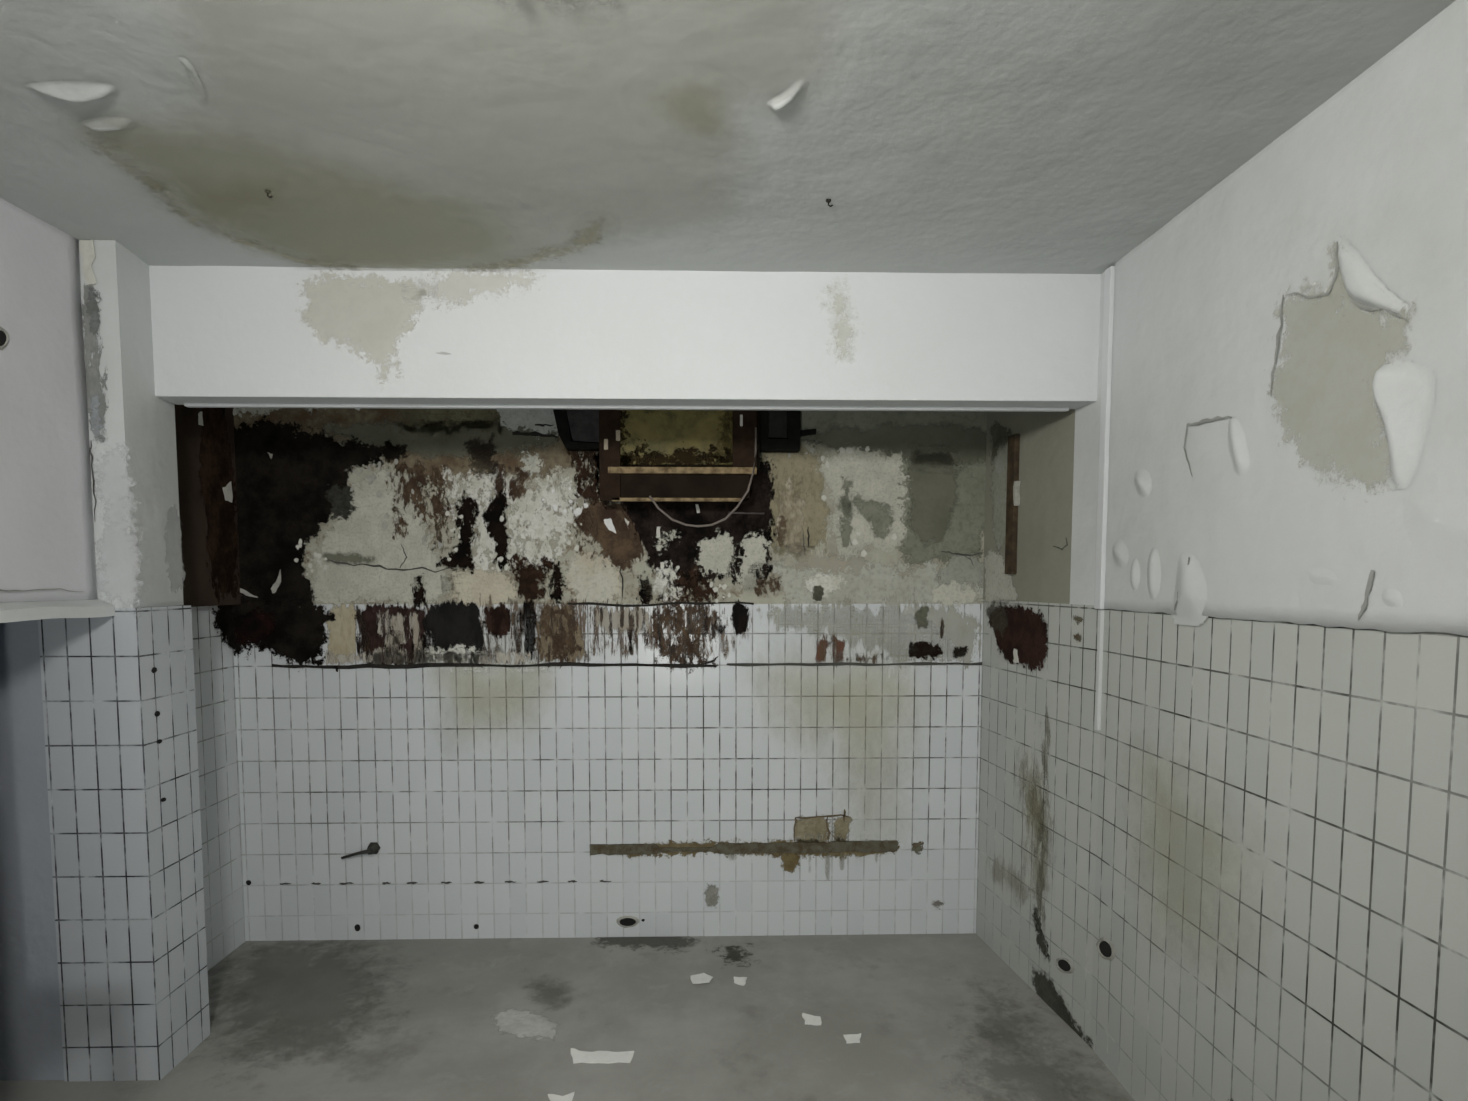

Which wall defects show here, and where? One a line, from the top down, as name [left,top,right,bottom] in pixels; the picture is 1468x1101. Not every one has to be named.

spalling [79,239,109,518]
peeling [222,481,233,503]
peeling [233,408,282,418]
peeling [271,409,1021,612]
peeling [1268,234,1436,492]
corrosion [622,809,924,873]
leakage [1032,715,1093,1049]